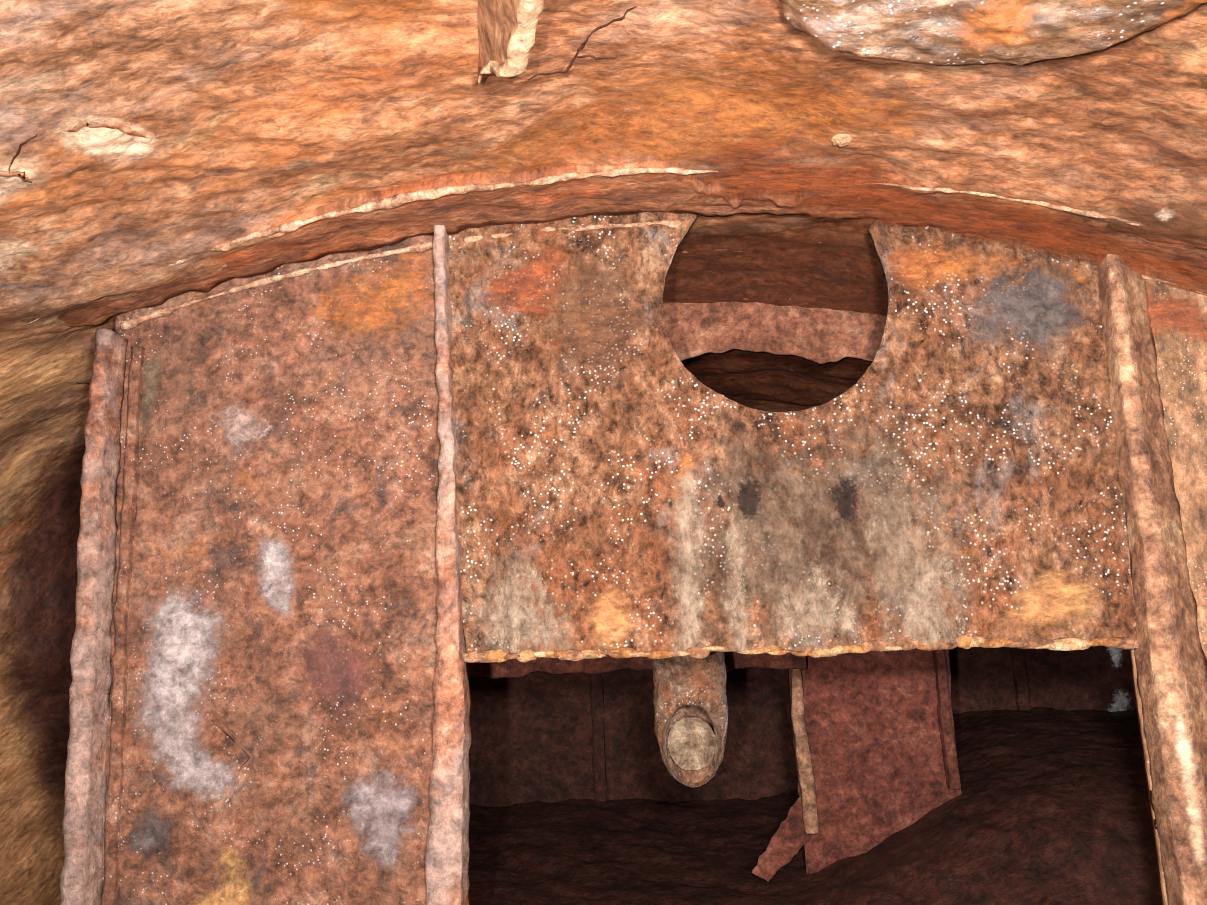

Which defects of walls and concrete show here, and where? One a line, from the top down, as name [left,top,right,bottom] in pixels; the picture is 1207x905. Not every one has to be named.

peeling [477,0,544,85]
crack [528,6,636,80]
rust [491,59,1207,341]
rust [318,257,425,329]
damp [0,306,87,431]
rust [682,350,872,406]
damp [0,419,64,501]
damp [675,428,967,657]
rust [593,592,632,640]
rust [1014,574,1099,625]
damp [0,441,86,905]
rust [198,849,247,905]